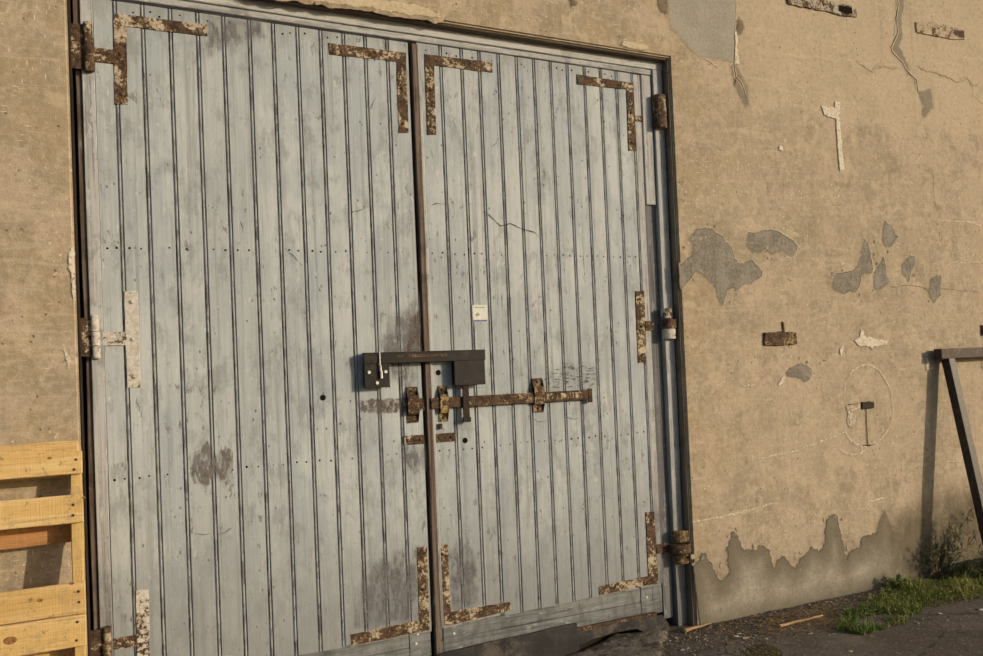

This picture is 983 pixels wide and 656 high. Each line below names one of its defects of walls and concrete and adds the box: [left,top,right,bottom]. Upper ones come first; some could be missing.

peeling [658,0,745,66]
crack [701,58,748,105]
crack [889,0,919,93]
spalling [822,101,845,171]
peeling [678,223,799,307]
peeling [831,219,899,296]
peeling [927,274,942,305]
peeling [778,357,812,385]
peeling [691,512,887,625]